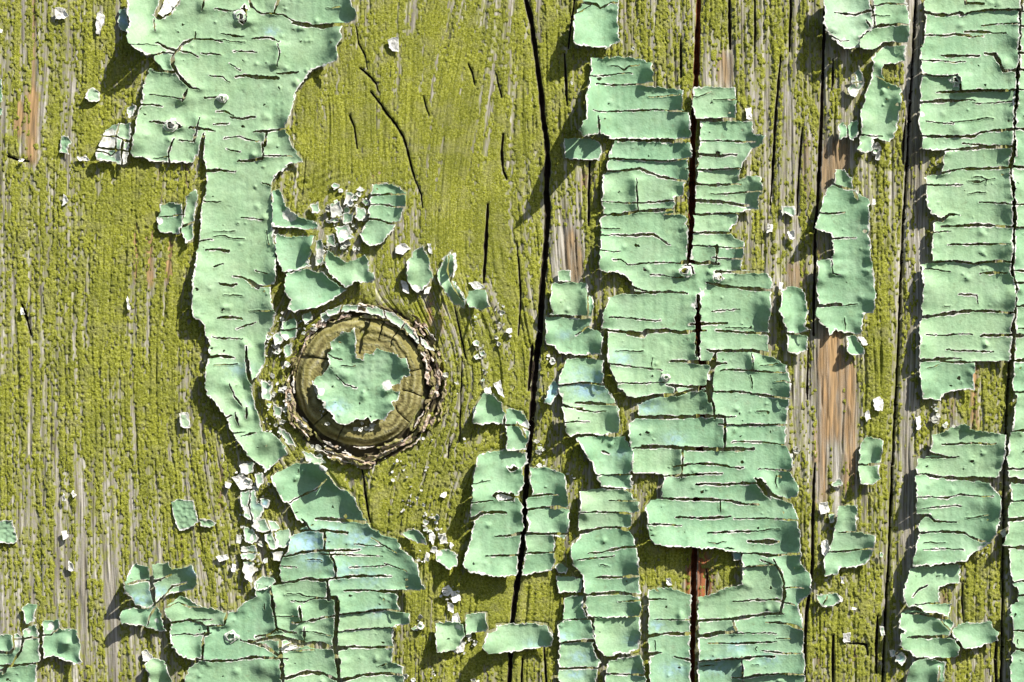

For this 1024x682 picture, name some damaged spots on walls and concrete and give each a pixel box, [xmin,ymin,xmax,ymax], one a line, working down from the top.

crack [355,26,423,208]
crack [728,0,756,52]
peeling [823,0,911,160]
crack [679,0,706,418]
peeling [59,0,876,682]
crack [510,0,575,623]
peeling [858,436,883,485]
peeling [865,396,884,422]
peeling [889,0,1024,682]
peeling [0,603,82,682]
crack [507,647,547,682]
crack [690,547,709,682]